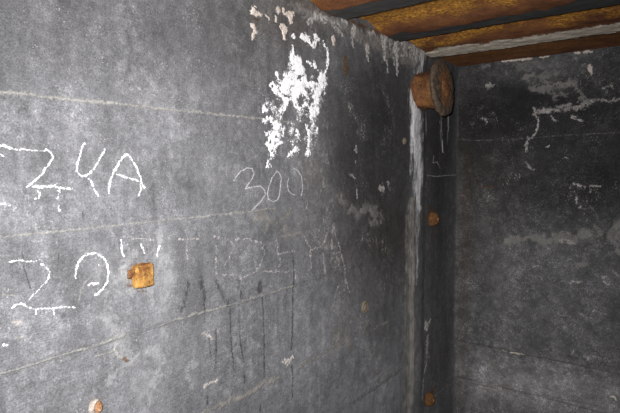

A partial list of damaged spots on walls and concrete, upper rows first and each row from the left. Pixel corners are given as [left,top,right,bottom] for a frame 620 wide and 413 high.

efflorescence [262,30,332,168]
efflorescence [402,91,427,413]